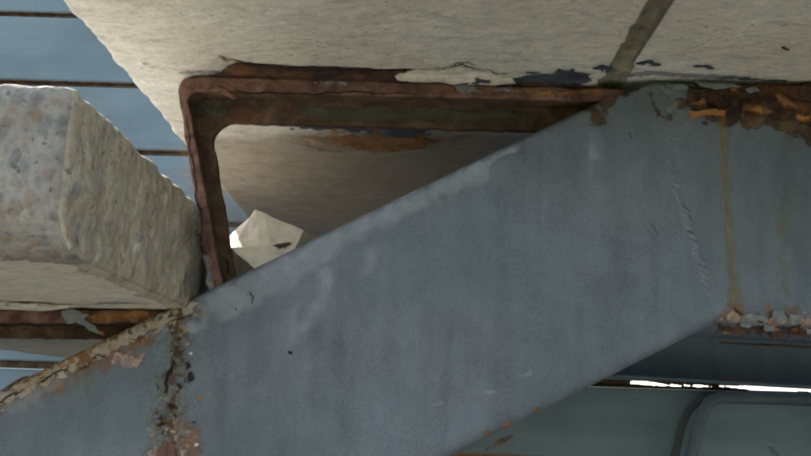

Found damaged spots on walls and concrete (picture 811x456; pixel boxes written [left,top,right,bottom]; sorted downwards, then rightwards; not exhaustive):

spalling [208,63,417,83]
spalling [490,77,604,89]
rust [584,83,678,126]
rust [290,126,439,152]
peeling [716,306,811,341]
rust [50,308,202,456]